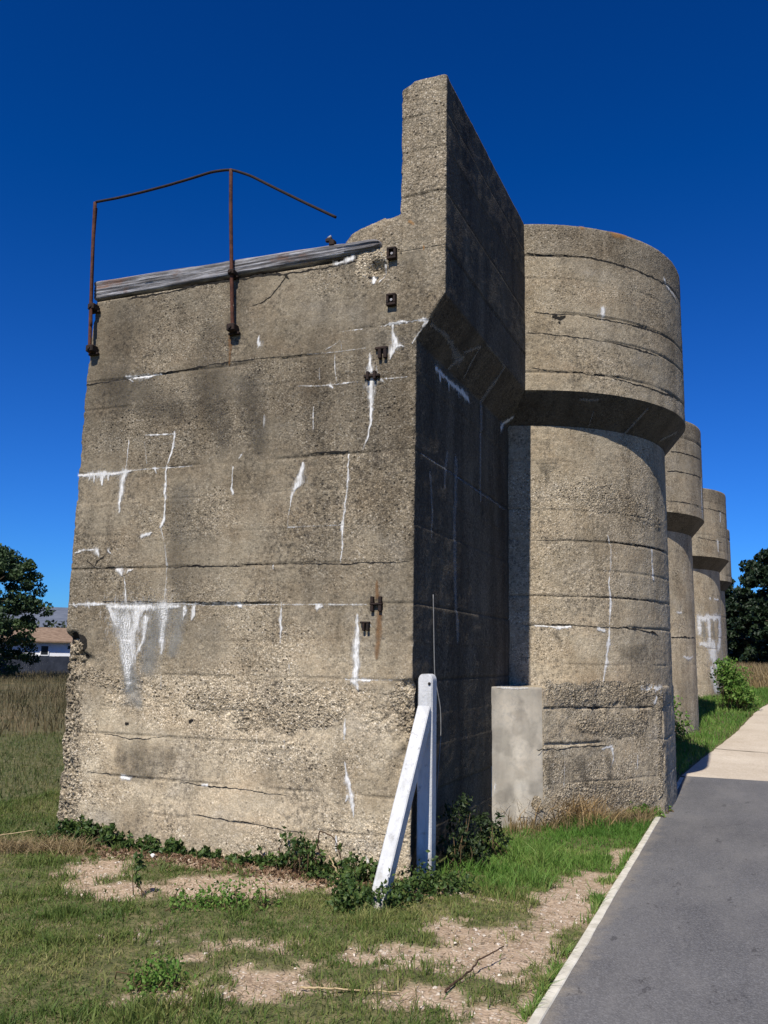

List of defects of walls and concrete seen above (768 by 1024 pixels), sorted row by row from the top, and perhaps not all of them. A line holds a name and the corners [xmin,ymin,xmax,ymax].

crack [130,261,355,306]
leakage [365,354,387,443]
leakage [78,443,132,512]
leakage [141,432,175,537]
leakage [289,462,304,510]
leakage [329,454,349,561]
leakage [73,569,242,688]
leakage [279,602,371,690]
spalling [57,632,127,827]
crack [185,782,288,796]
crack [196,814,298,832]